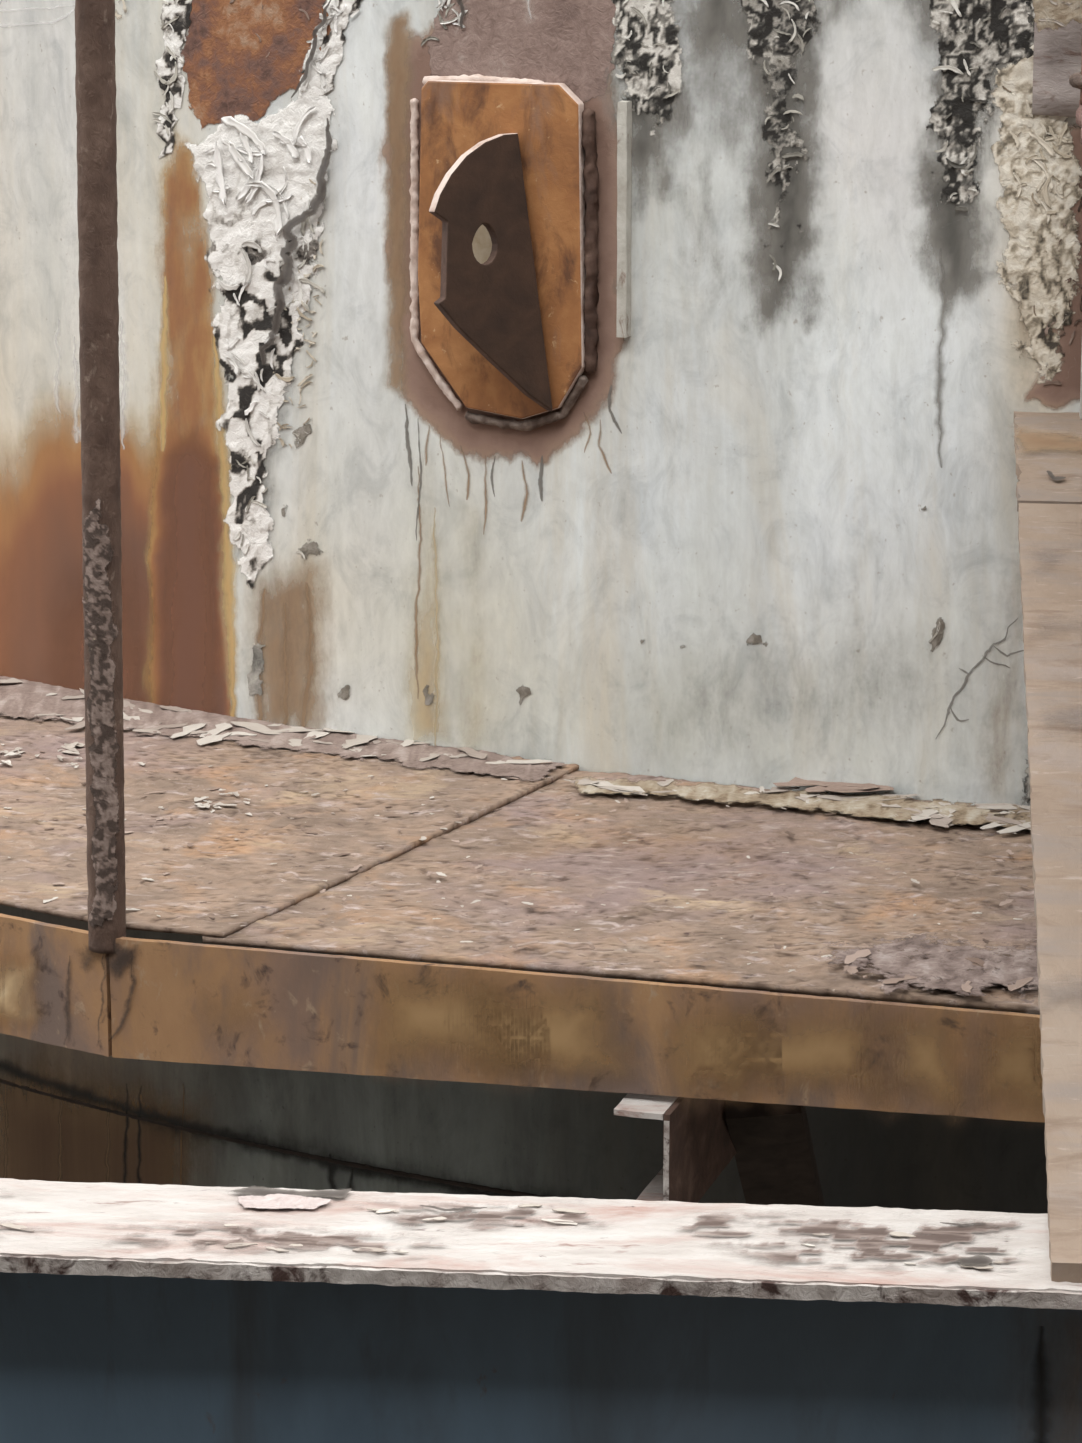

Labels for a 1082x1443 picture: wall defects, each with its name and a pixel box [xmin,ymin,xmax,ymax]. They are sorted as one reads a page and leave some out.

corrosion [0,412,85,690]
corrosion [120,144,236,717]
peeling [152,0,361,588]
peeling [0,498,1031,927]
peeling [421,0,820,319]
crack [936,618,1024,739]
peeling [912,0,1082,468]
corrosion [0,966,29,1018]
corrosion [83,944,135,977]
spalling [821,923,1039,1003]